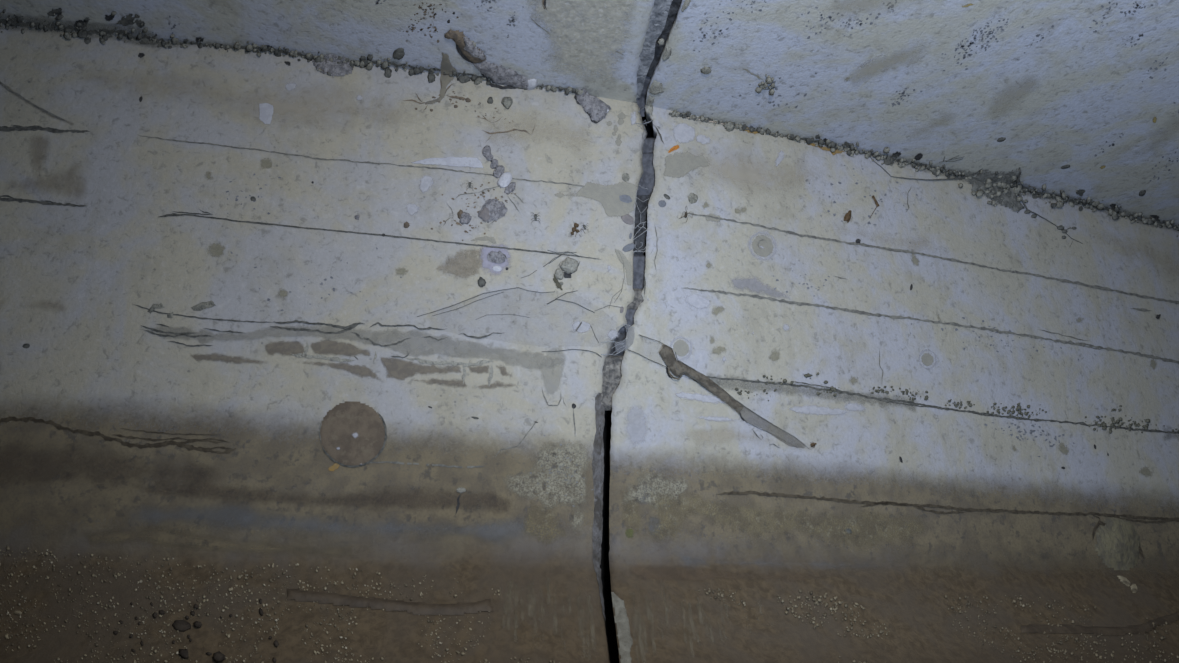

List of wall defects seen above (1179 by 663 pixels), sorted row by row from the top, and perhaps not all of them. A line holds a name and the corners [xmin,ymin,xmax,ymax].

crack [644,224,658,295]
crack [688,213,1179,304]
crack [136,305,267,323]
spalling [193,340,510,388]
crack [687,287,1179,364]
crack [707,348,1179,436]
crack [0,416,236,454]
damp [0,410,594,542]
damp [609,464,1179,566]
crack [717,491,1179,523]